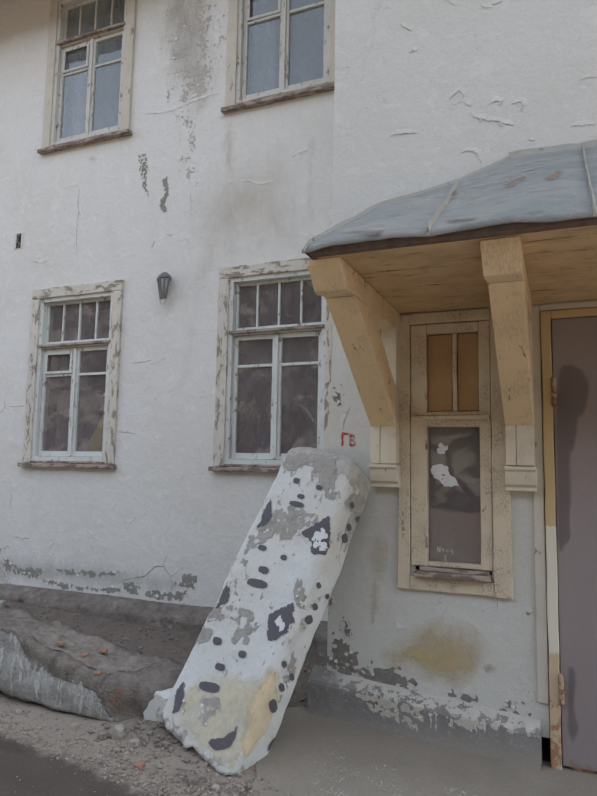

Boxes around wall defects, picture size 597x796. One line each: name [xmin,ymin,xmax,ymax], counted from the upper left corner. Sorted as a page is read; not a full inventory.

peeling [161,0,226,184]
peeling [138,154,149,196]
peeling [159,176,169,212]
peeling [3,558,197,604]
peeling [196,605,259,644]
peeling [325,598,534,737]